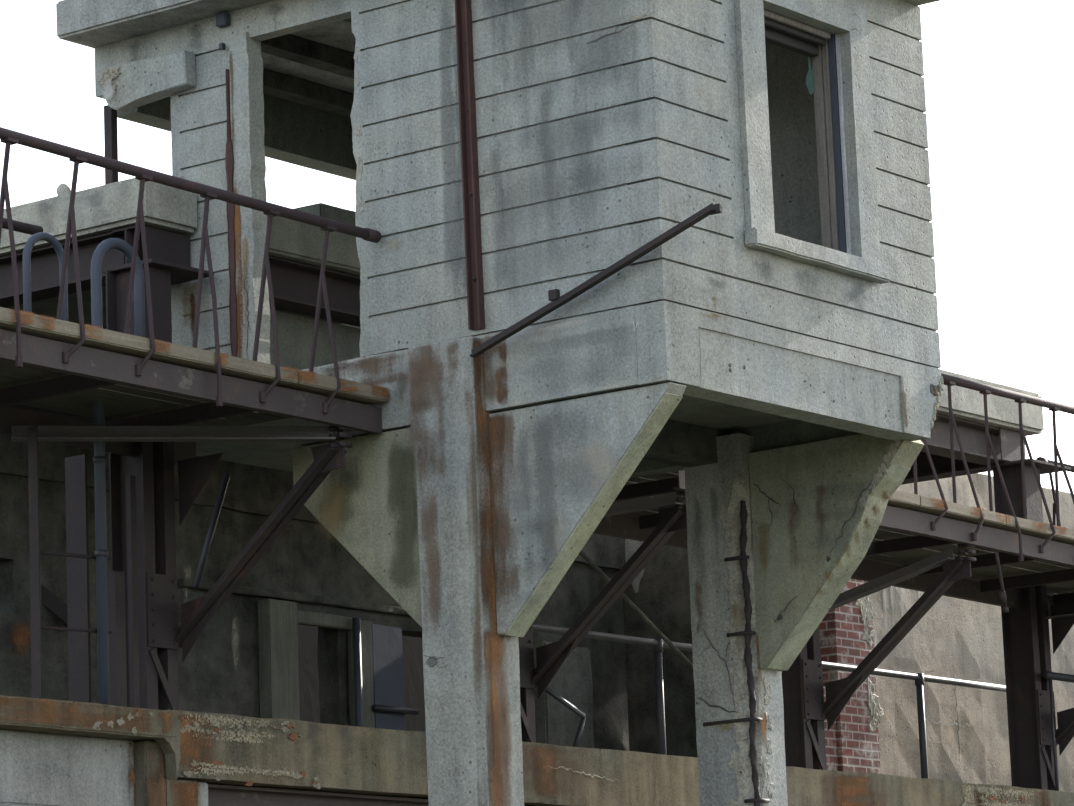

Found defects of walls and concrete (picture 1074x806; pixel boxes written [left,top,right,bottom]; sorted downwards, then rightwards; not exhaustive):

spalling [99,67,122,99]
rust [328,343,457,474]
rust [422,500,439,621]
spalling [703,473,775,806]
rust [0,696,213,770]
peeling [180,713,304,744]
rust [148,749,199,806]
peeling [183,759,321,789]
peeling [960,785,1037,806]